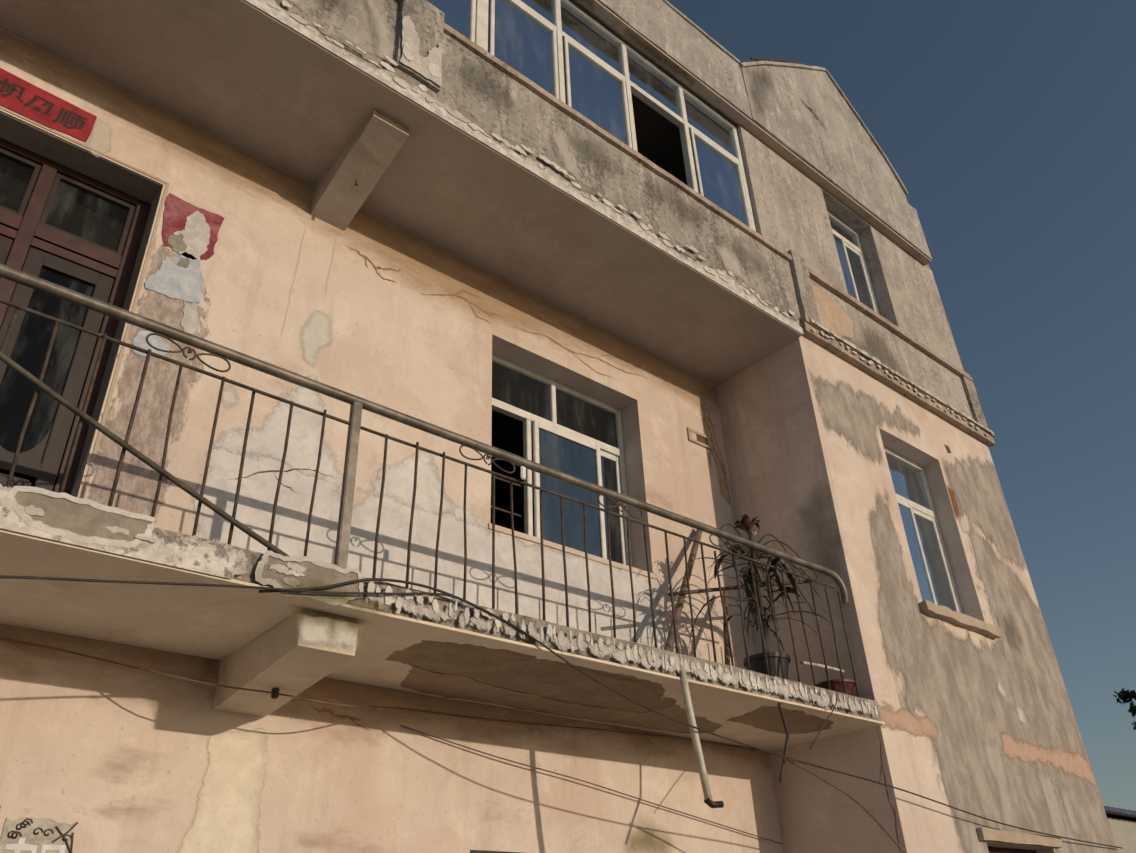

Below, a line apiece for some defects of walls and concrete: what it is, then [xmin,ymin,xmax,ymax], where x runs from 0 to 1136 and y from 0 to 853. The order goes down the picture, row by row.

damp [368,0,393,61]
damp [0,29,314,210]
damp [553,132,579,178]
crack [325,241,401,298]
damp [338,209,718,404]
crack [420,290,644,377]
peeling [246,0,993,436]
damp [717,247,746,281]
peeling [812,376,920,463]
peeling [0,375,878,735]
peeling [870,445,1118,853]
peeling [177,728,268,853]